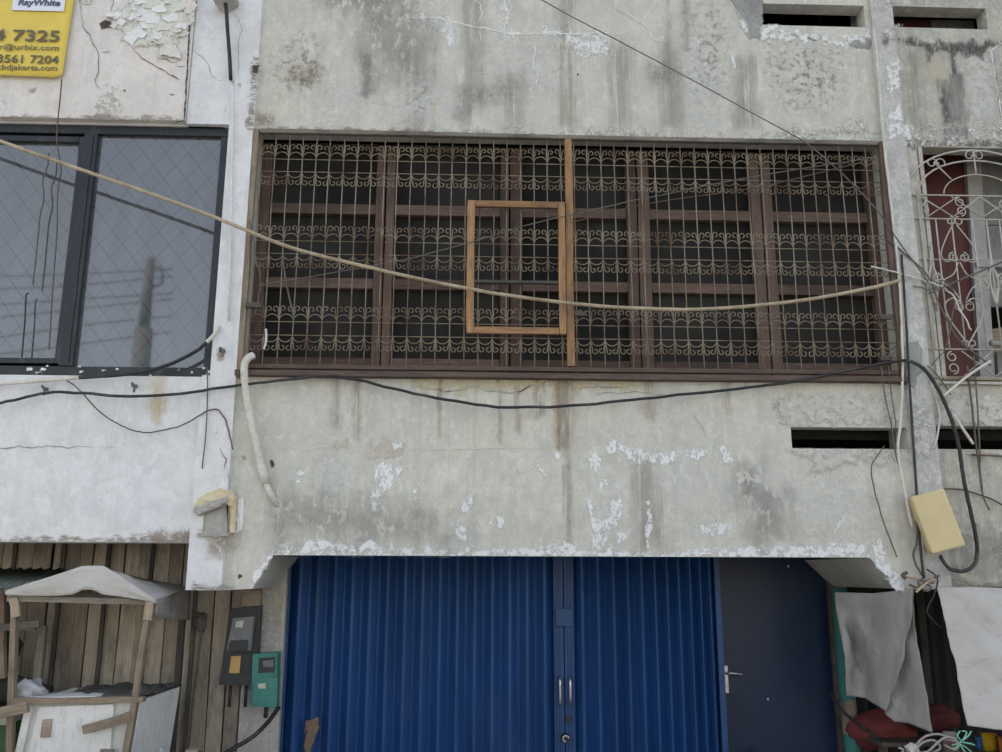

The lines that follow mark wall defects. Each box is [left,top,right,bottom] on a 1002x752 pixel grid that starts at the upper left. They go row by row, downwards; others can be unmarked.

crack [79,0,101,90]
peeling [99,0,198,59]
crack [403,0,664,87]
peeling [885,58,901,93]
water stain [905,38,997,125]
peeling [738,104,1002,150]
peeling [587,451,609,491]
peeling [624,448,707,466]
spalling [193,488,245,537]
peeling [192,497,904,591]